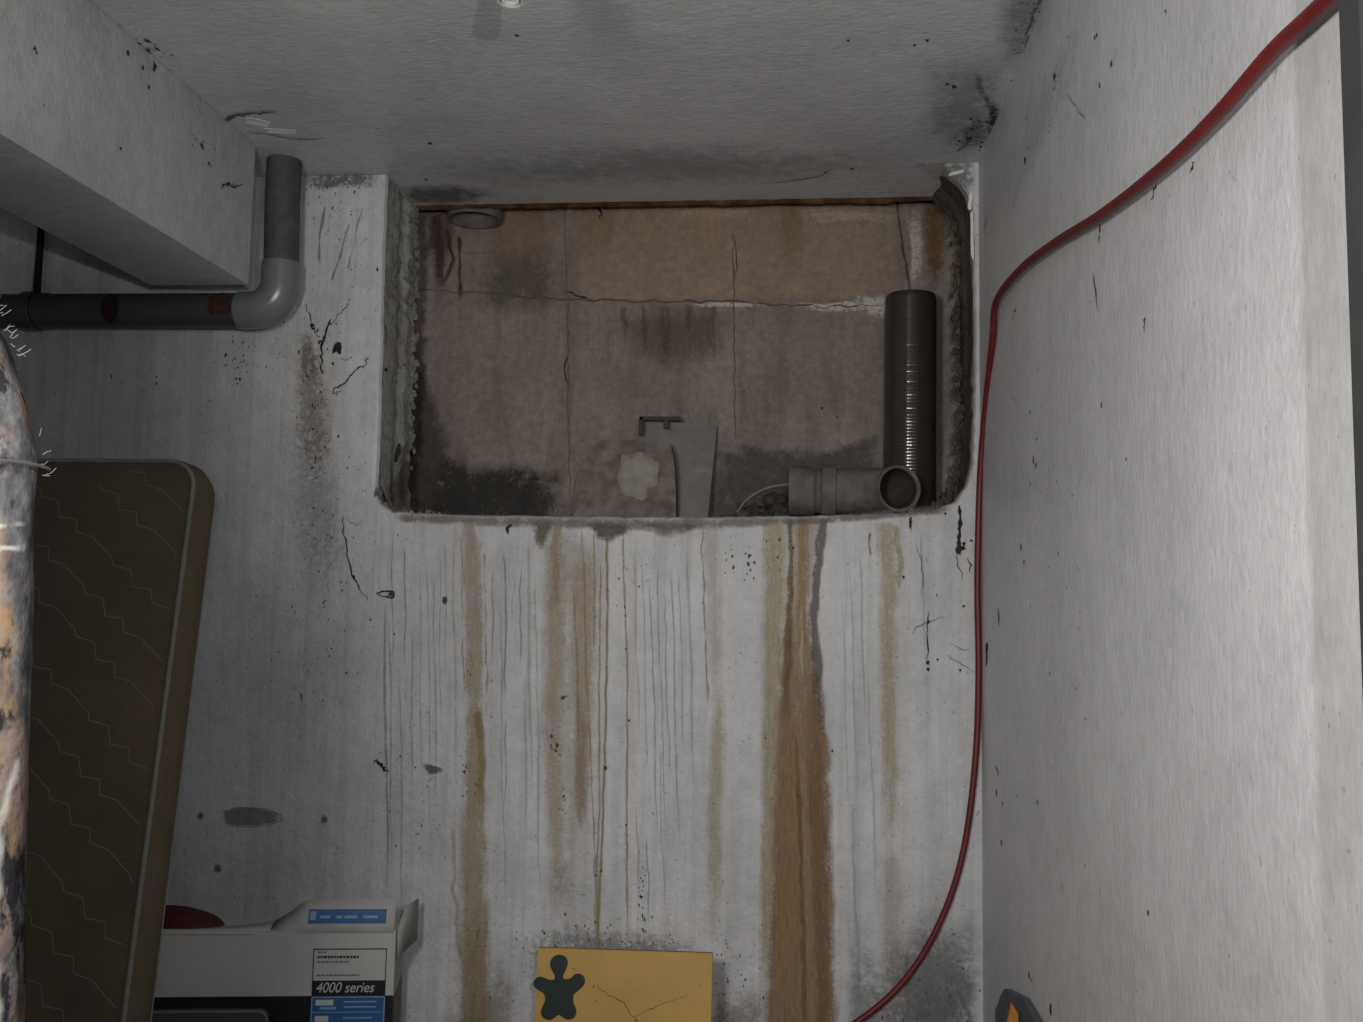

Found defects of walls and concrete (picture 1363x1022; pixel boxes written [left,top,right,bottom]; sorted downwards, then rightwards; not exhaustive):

damp [920,88,998,184]
damp [214,309,364,620]
crack [306,303,368,396]
damp [391,354,553,516]
crack [418,207,880,502]
corrosion [460,704,484,815]
corrosion [763,523,835,1022]